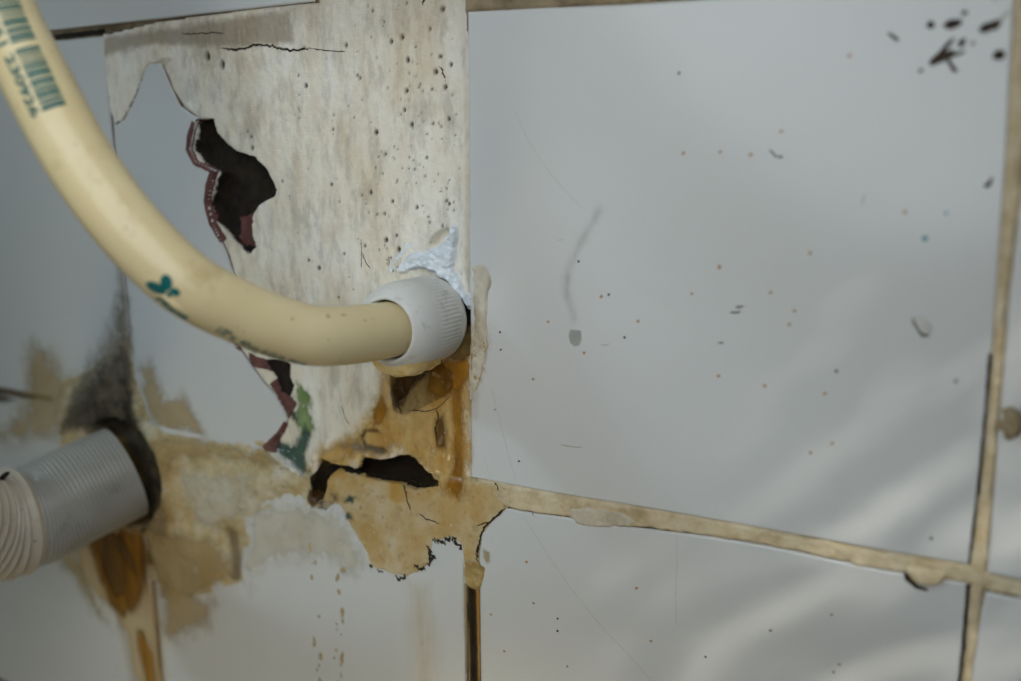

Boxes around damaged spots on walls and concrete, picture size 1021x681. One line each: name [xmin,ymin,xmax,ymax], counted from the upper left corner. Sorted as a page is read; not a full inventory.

crack [182,31,345,52]
flaking render [103,0,471,362]
leakage [69,278,161,506]
leakage [143,369,200,431]
spalling [55,333,510,597]
rust [319,354,476,497]
rust [79,528,162,681]